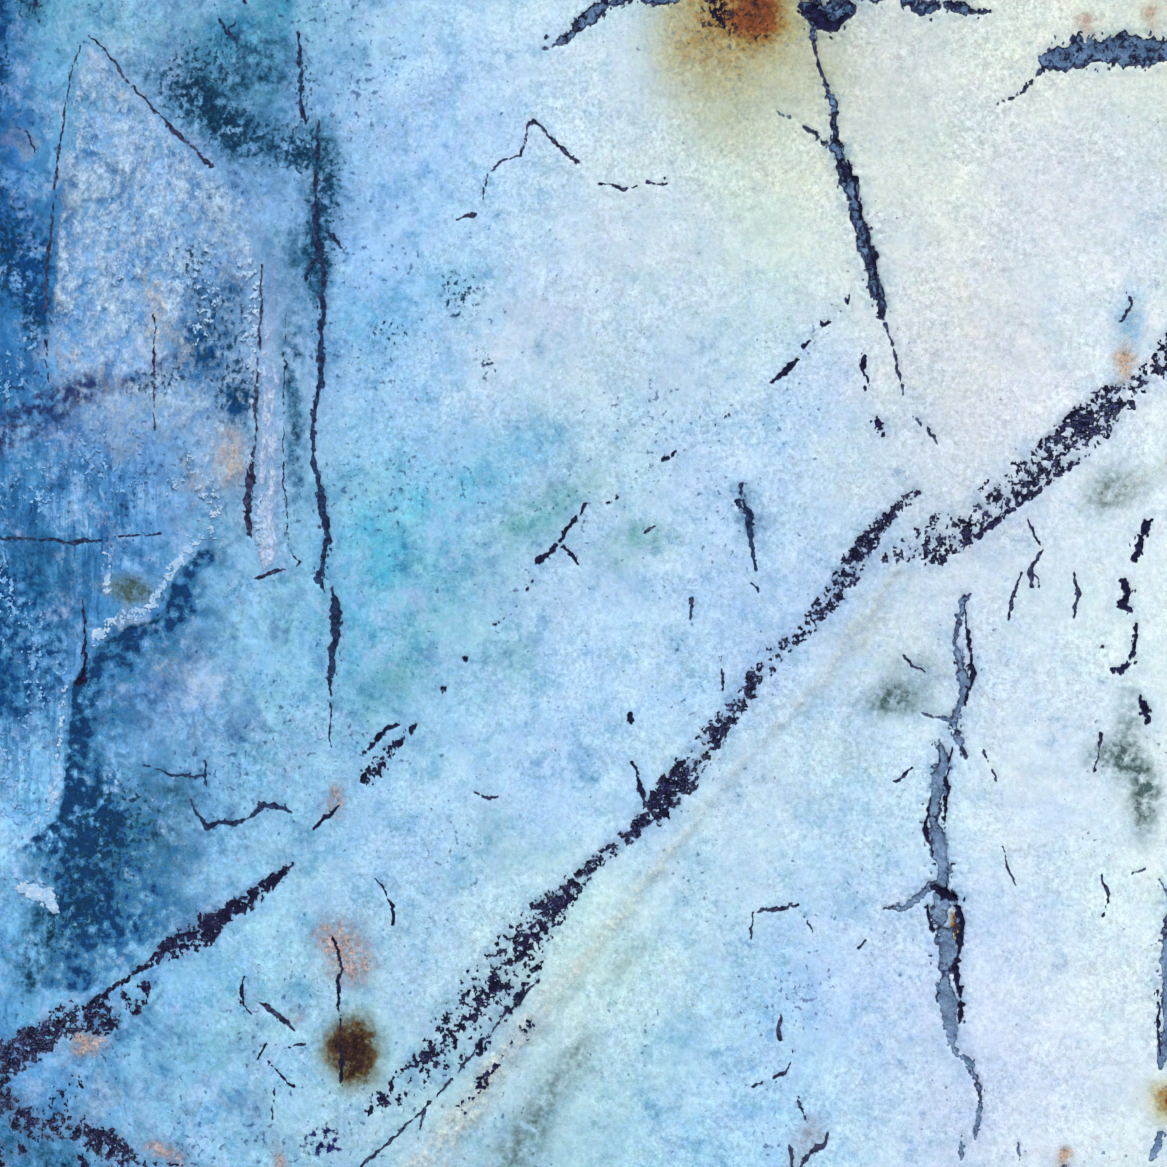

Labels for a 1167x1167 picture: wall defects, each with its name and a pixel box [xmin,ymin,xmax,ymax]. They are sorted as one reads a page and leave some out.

crack [542,0,680,50]
corrosion [675,0,792,76]
crack [456,118,668,220]
crack [770,0,992,443]
crack [242,31,343,747]
peeling [0,48,294,1167]
crack [1100,518,1154,724]
crack [143,760,340,830]
corrosion [322,1015,379,1086]
crack [883,593,997,1160]
crack [1100,868,1167,1069]
corrosion [1155,1086,1167,1115]